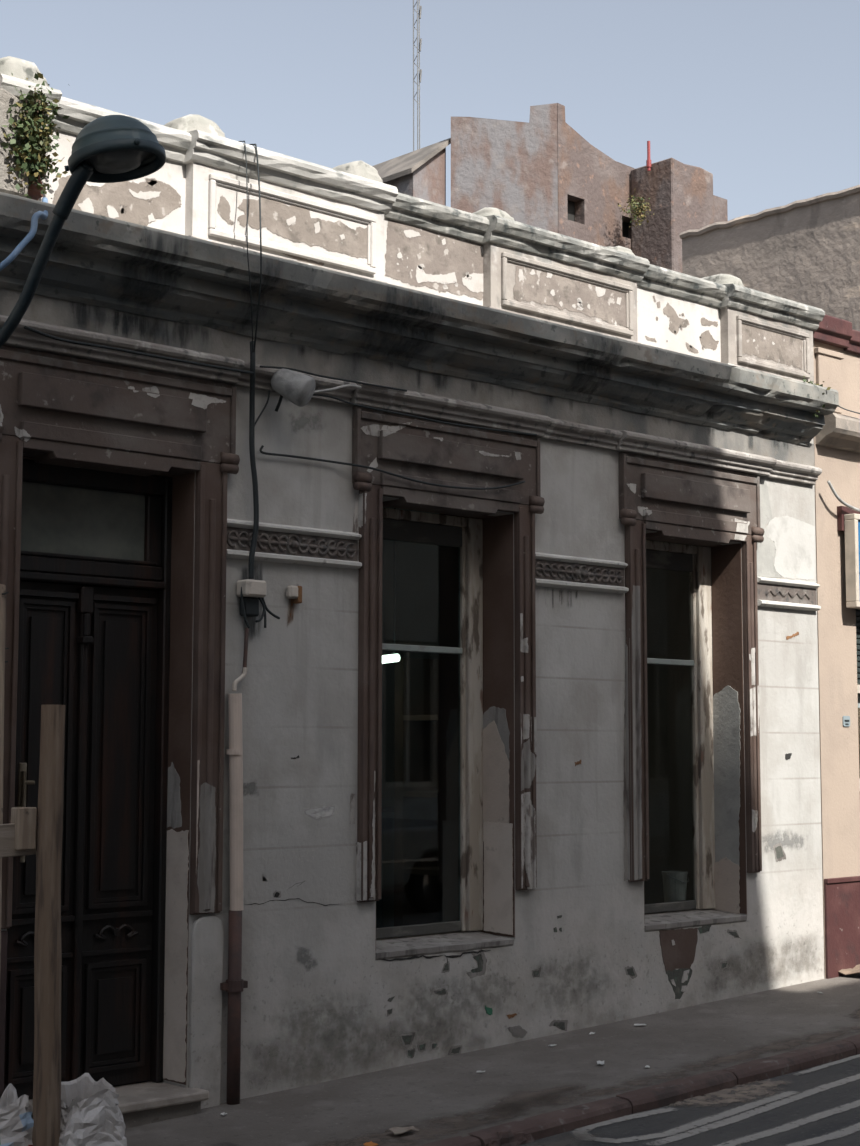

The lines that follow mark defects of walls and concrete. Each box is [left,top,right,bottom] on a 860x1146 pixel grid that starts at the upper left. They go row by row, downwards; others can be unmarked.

peeling [73,178,182,226]
peeling [217,196,368,266]
peeling [385,219,483,300]
peeling [513,266,626,327]
peeling [645,295,719,353]
peeling [712,648,760,914]
peeling [483,706,537,935]
flaking render [773,842,786,862]
peeling [163,760,216,1082]
crack [245,882,336,906]
flaking render [467,949,487,978]
flaking render [399,1032,462,1058]